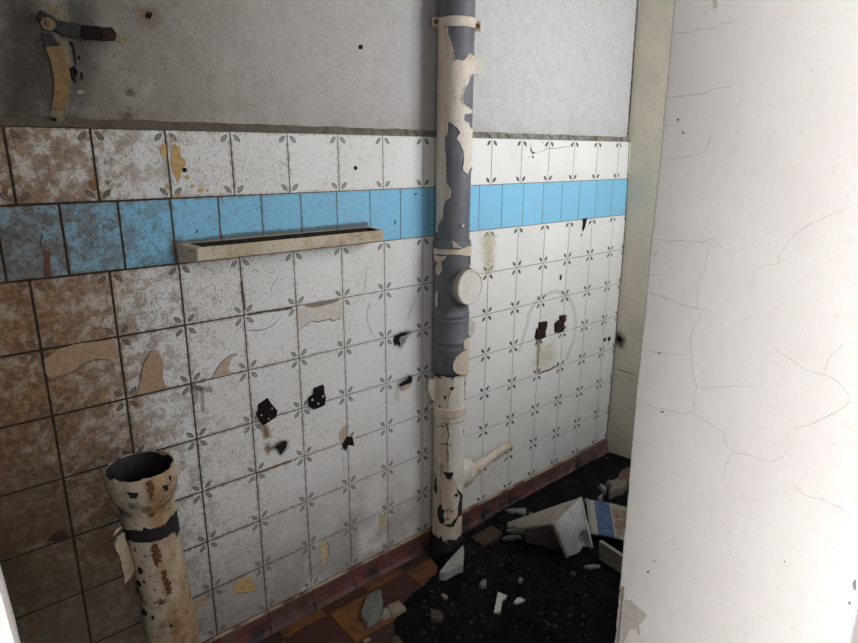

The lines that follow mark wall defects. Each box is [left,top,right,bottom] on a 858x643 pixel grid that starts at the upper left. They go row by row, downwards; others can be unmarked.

spalling [59,38,85,95]
spalling [160,136,209,197]
spalling [297,299,343,330]
spalling [44,339,117,379]
spalling [136,350,170,395]
spalling [212,353,237,378]
crack [642,238,784,481]
crack [775,342,855,429]
spalling [339,426,354,451]
spalling [617,586,647,643]